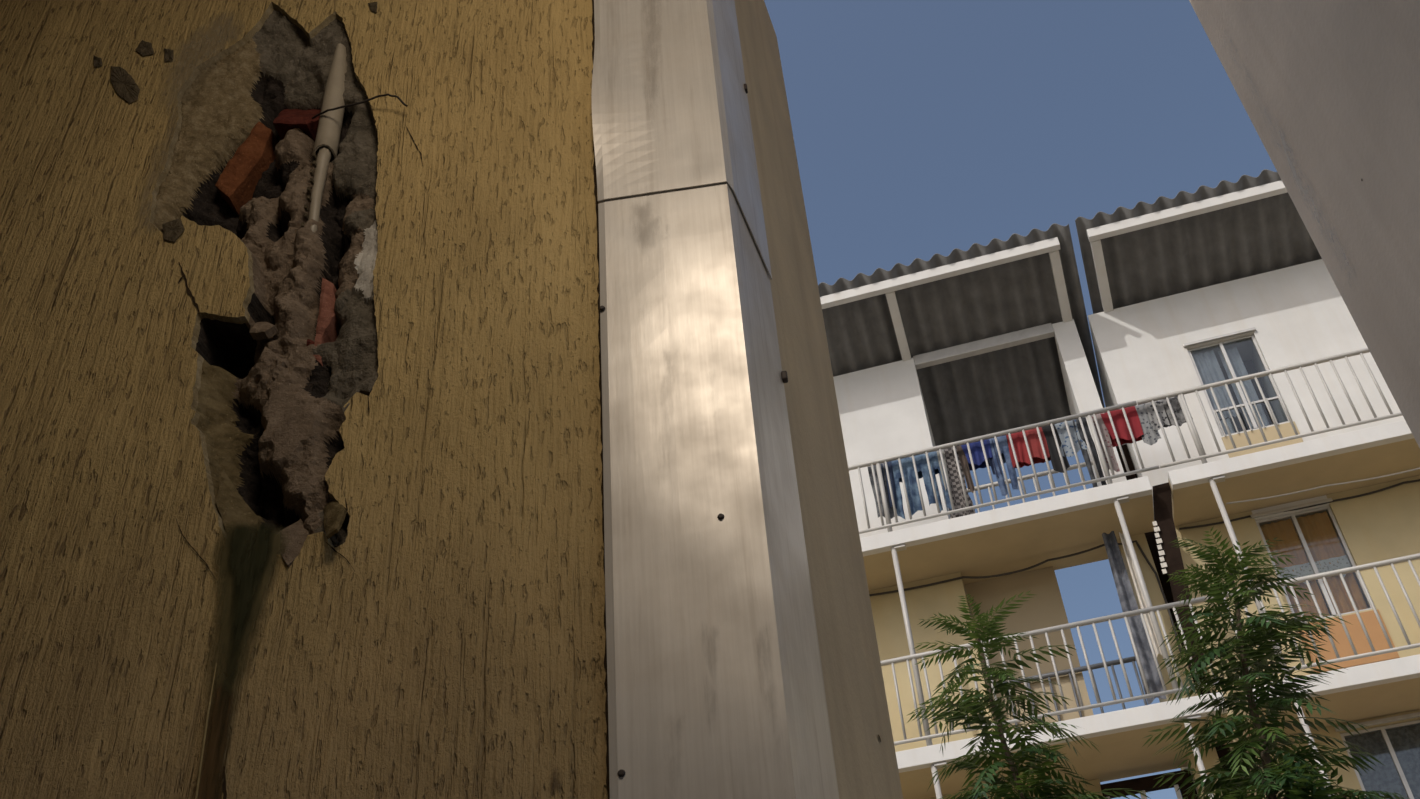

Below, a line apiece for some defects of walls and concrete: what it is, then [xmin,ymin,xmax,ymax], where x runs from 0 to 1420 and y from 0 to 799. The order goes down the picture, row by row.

spalling [150,2,379,567]
crack [176,519,216,579]
crack [220,767,228,799]
leakage [194,524,284,799]